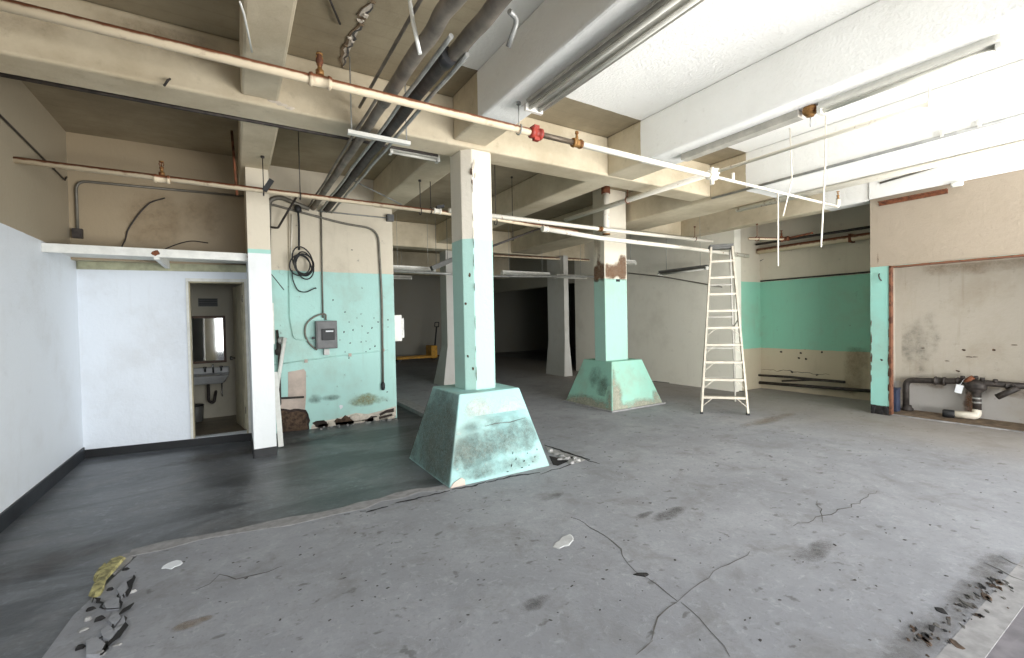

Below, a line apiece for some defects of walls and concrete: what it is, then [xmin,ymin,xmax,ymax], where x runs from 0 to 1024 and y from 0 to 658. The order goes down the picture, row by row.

crack [795,491,877,525]
spalling [75,556,137,658]
crack [571,517,750,655]